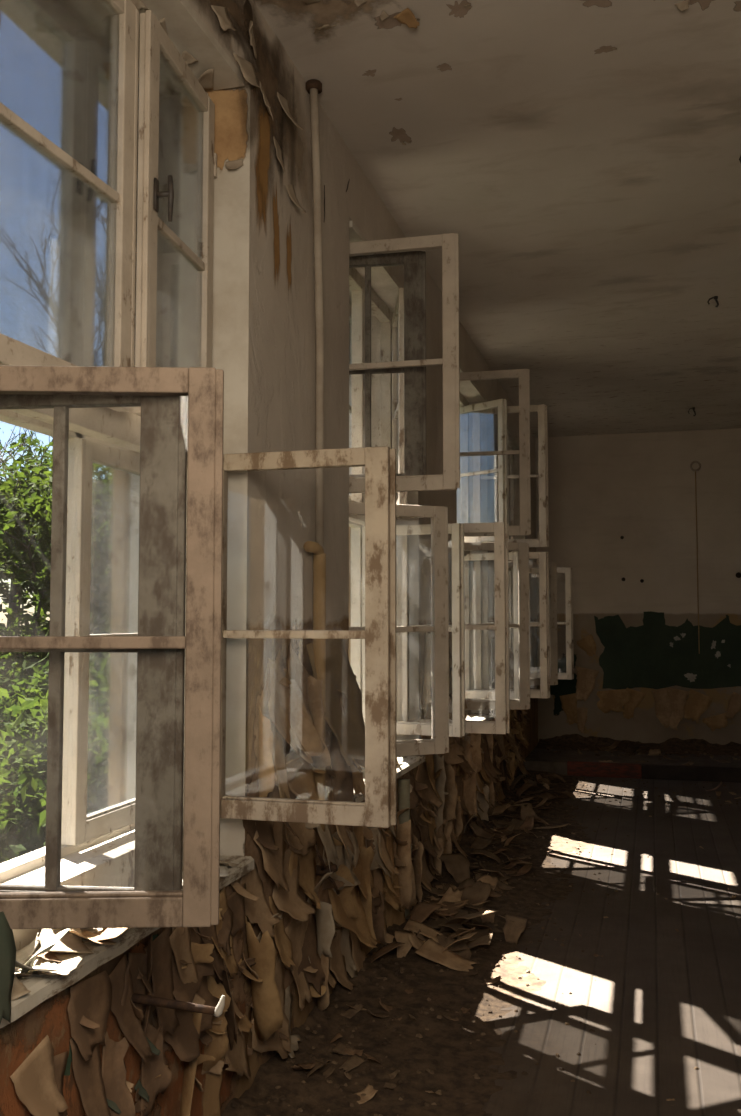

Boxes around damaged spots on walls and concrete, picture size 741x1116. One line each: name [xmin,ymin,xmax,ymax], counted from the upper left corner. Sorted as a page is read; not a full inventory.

spalling [182,5,303,170]
leakage [199,0,304,290]
leakage [257,0,378,39]
peeling [550,611,741,733]
peeling [0,621,577,1116]